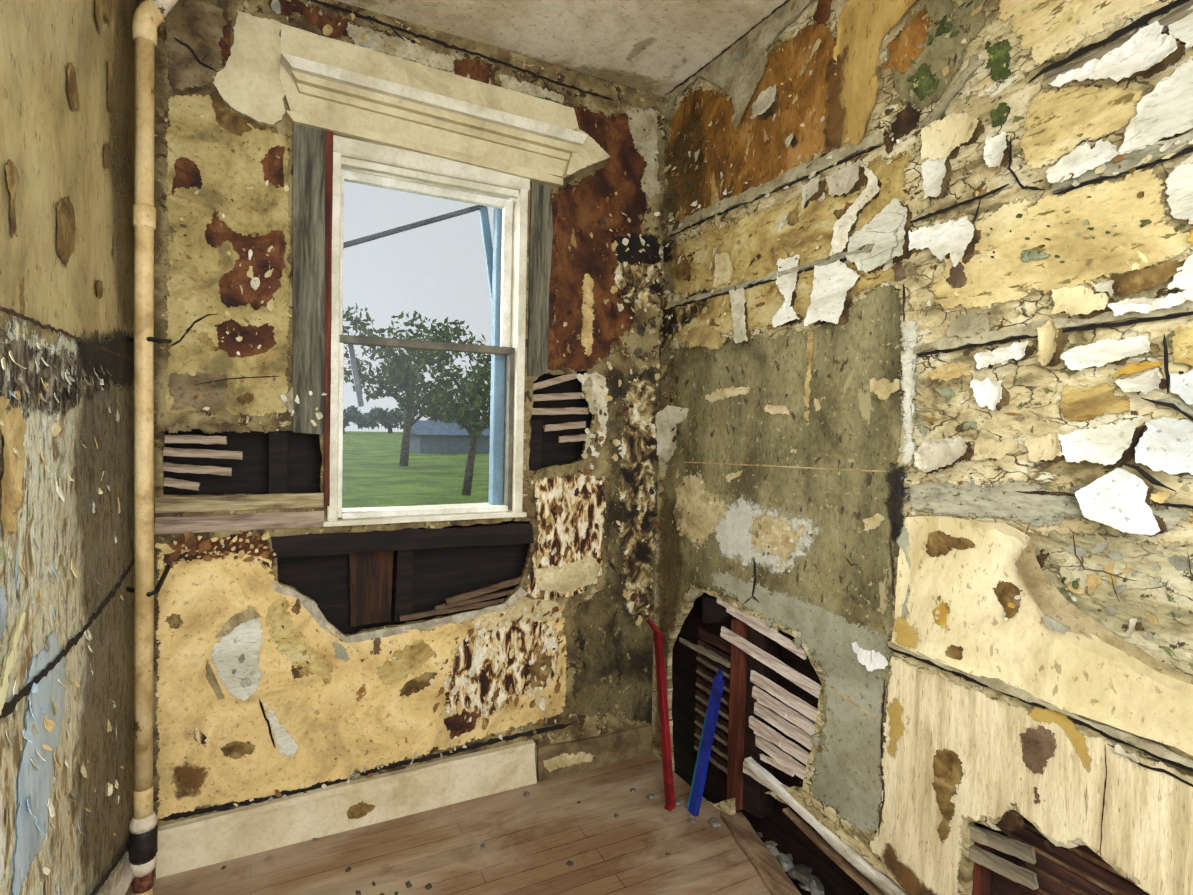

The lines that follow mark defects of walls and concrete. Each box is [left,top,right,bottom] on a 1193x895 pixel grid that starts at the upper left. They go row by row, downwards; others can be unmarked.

damp [154,33,164,122]
peeling [268,0,492,84]
peeling [163,0,300,417]
peeling [0,314,82,374]
damp [0,0,145,875]
spalling [155,422,324,513]
flaking render [529,0,1193,843]
peeling [0,377,124,895]
crack [0,558,135,718]
peeling [154,462,606,820]
damp [174,762,207,799]
spalling [969,810,1149,895]